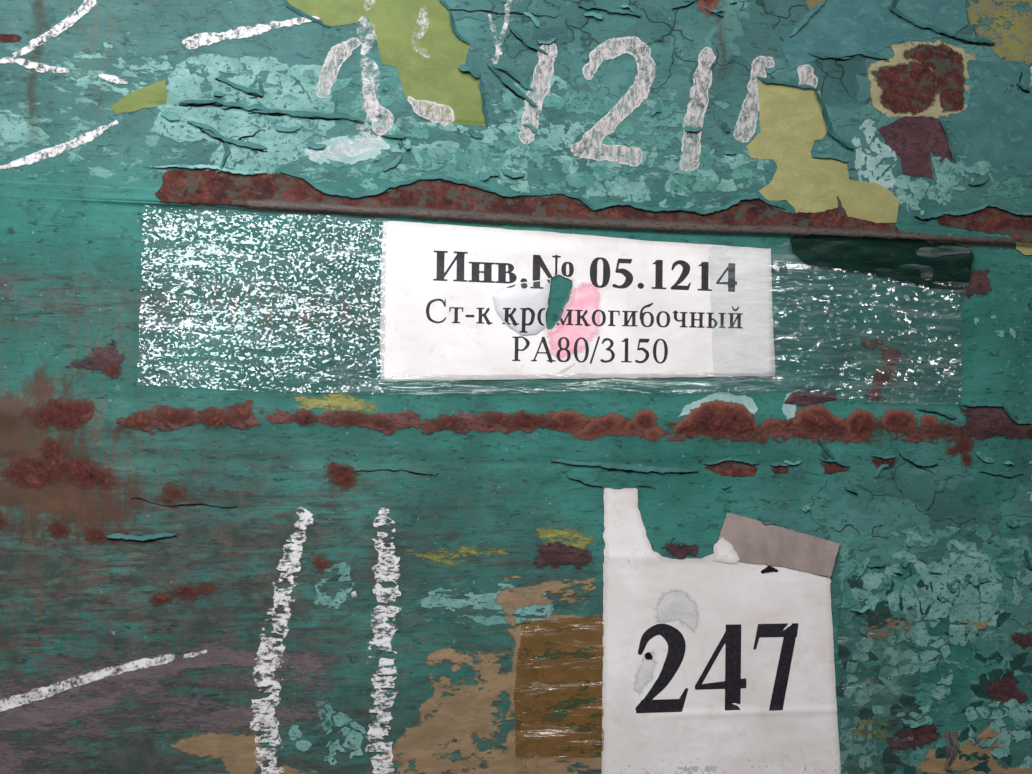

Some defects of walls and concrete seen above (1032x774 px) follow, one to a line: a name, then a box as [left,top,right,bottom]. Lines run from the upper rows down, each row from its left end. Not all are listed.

rust [697,0,719,17]
peeling [56,0,1032,223]
rust [871,44,965,115]
rust [152,164,899,235]
rust [937,203,1032,243]
rust [116,339,1032,468]
rust [0,370,141,544]
rust [157,483,193,505]
peeling [314,562,354,609]
peeling [836,521,1032,774]
peeling [0,631,366,774]